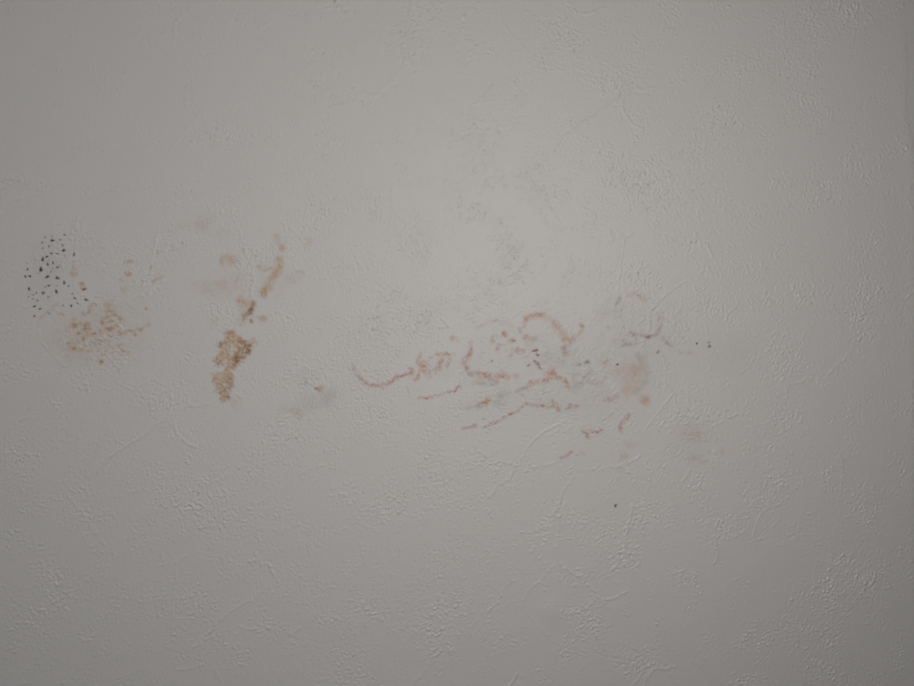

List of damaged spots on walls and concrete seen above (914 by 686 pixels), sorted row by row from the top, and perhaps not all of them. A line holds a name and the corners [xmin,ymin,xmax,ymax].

leakage [21,229,89,318]
leakage [350,289,768,475]